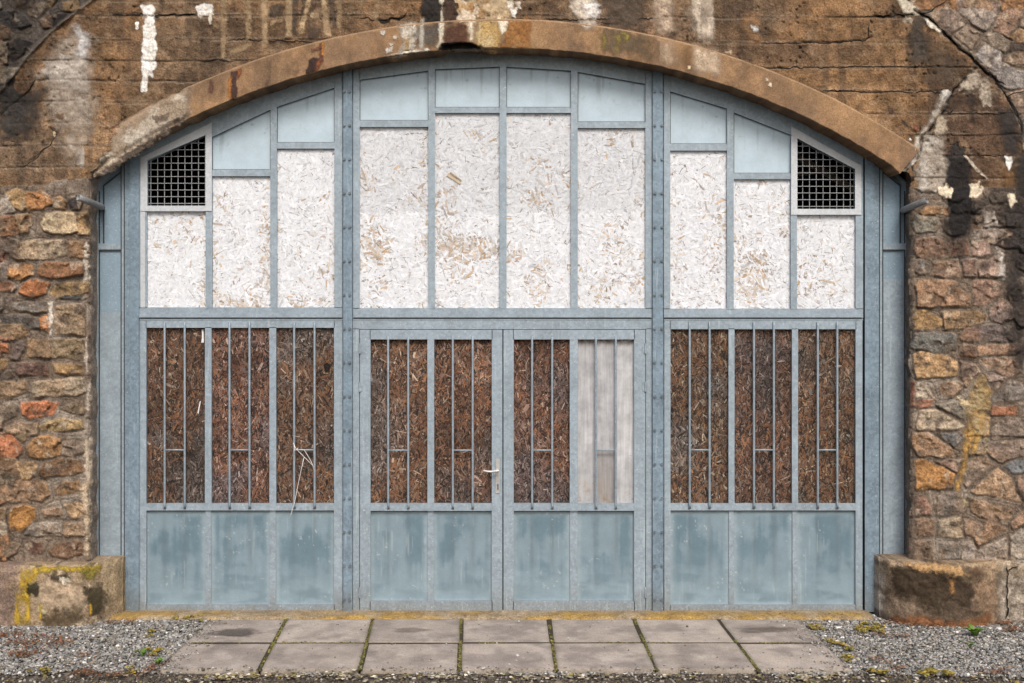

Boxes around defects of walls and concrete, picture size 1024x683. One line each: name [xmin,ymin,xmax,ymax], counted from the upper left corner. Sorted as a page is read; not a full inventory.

leakage [0,28,91,151]
leakage [135,4,158,92]
rust [228,69,241,100]
rust [306,42,324,74]
crack [763,0,1024,181]
spalling [78,93,189,177]
leakage [904,16,1024,364]
leakage [46,611,81,627]
leakage [891,566,982,607]